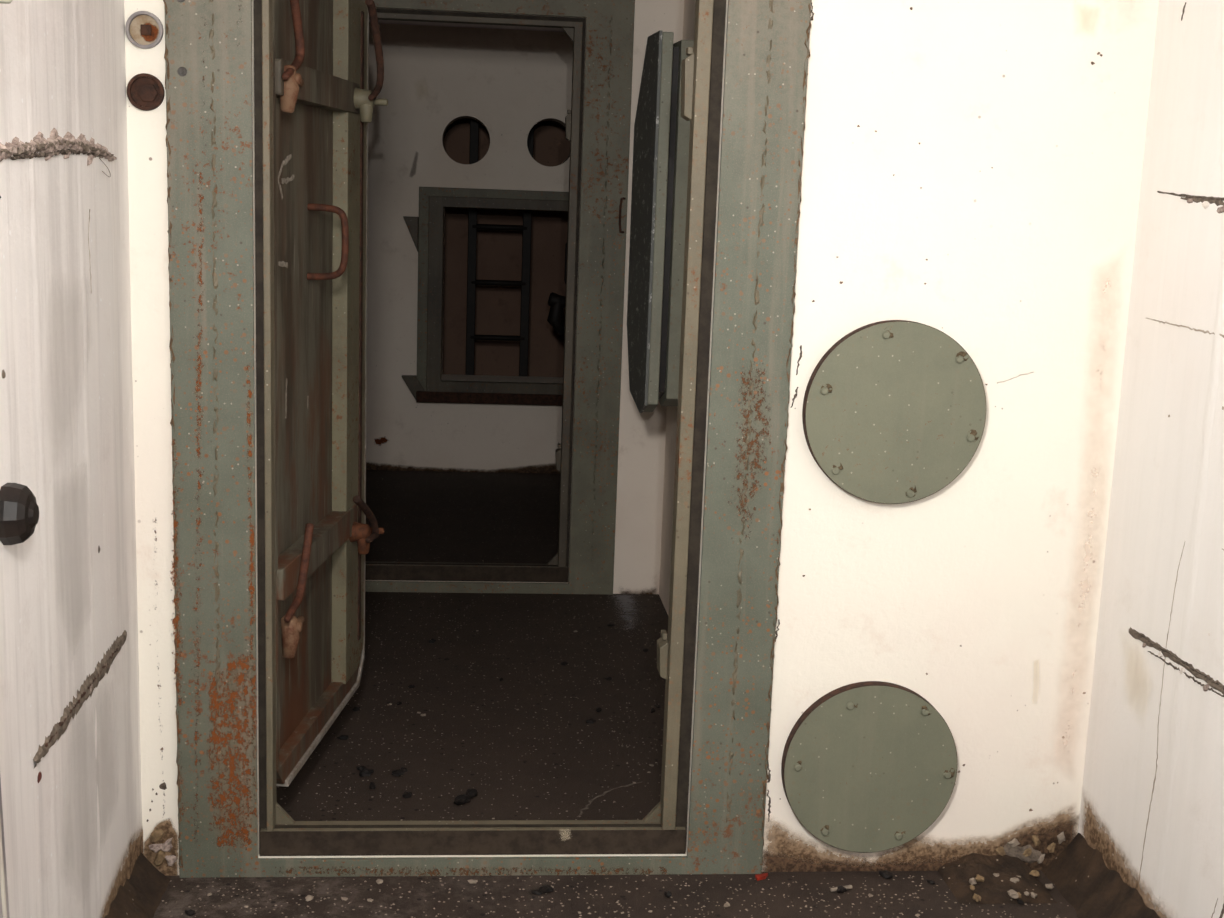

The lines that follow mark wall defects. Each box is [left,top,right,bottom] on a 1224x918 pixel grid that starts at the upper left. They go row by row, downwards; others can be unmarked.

corrosion [140,0,171,203]
crack [1157,191,1224,213]
corrosion [155,172,259,868]
corrosion [728,2,811,865]
crack [33,630,127,783]
crack [1129,542,1224,881]
water stain [762,802,1167,918]